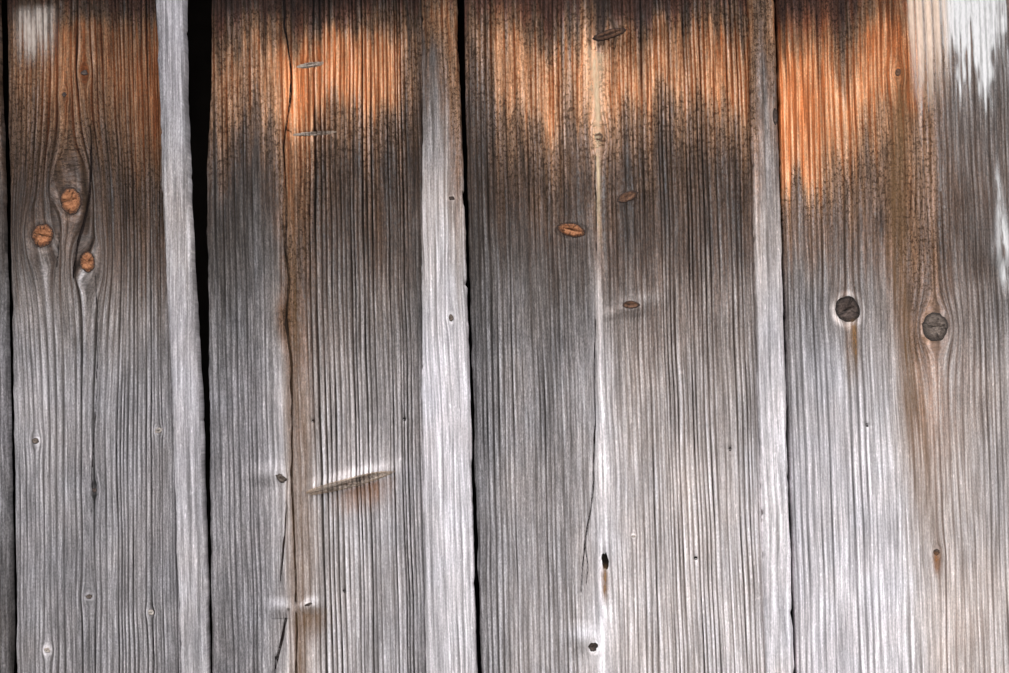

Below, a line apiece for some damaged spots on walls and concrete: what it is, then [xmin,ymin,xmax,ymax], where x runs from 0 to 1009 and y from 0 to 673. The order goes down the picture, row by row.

crack [274,0,298,673]
crack [581,319,596,591]